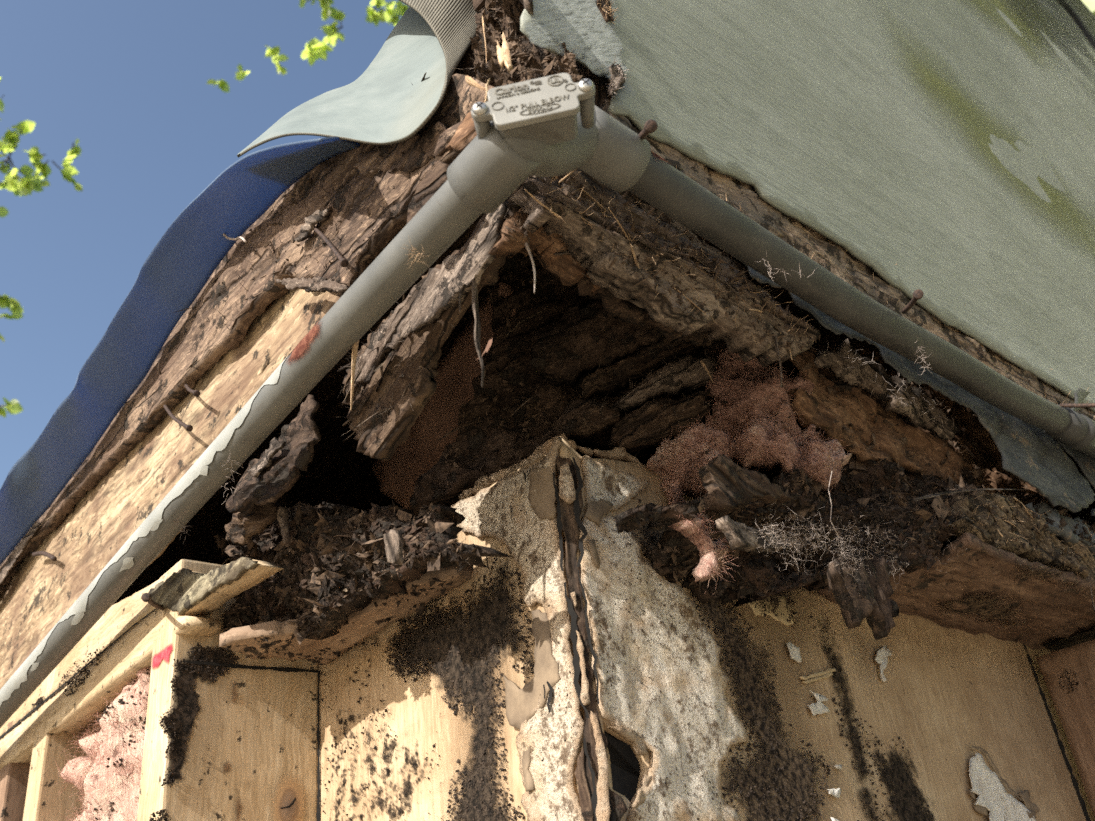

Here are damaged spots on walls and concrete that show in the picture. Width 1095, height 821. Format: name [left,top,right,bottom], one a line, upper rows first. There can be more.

leakage [159,643,239,788]
peeling [221,502,454,645]
leakage [319,500,550,821]
crack [543,456,628,821]
leakage [610,569,935,821]
peeling [787,642,802,662]
peeling [658,450,993,626]